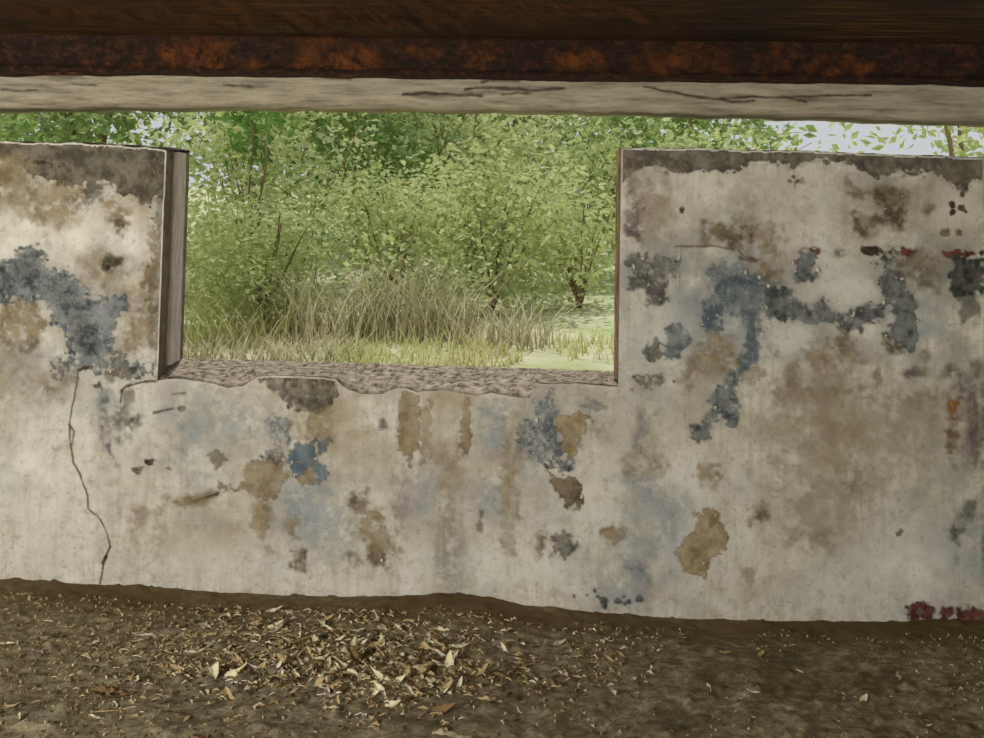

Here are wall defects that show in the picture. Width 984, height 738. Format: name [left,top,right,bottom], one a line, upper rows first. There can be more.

peeling [0,243,153,388]
crack [69,366,111,584]
flaking render [260,377,338,485]
peeling [514,388,584,510]
peeling [623,252,680,306]
peeling [632,374,674,390]
peeling [642,323,691,362]
peeling [689,246,932,444]
peeling [942,249,984,259]